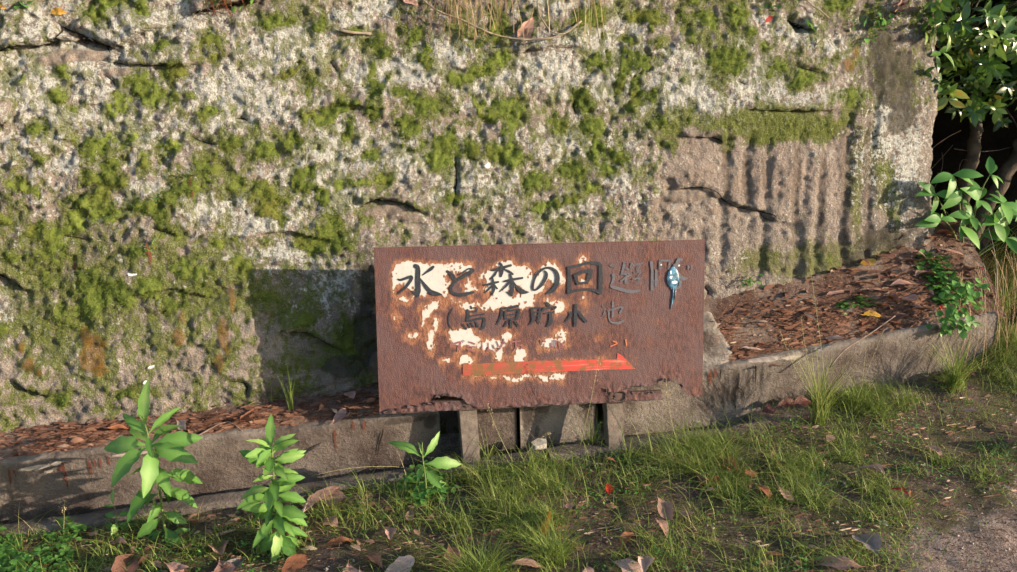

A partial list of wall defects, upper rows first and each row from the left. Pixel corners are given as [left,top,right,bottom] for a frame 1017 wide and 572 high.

crack [0,26,178,86]
crack [668,187,787,226]